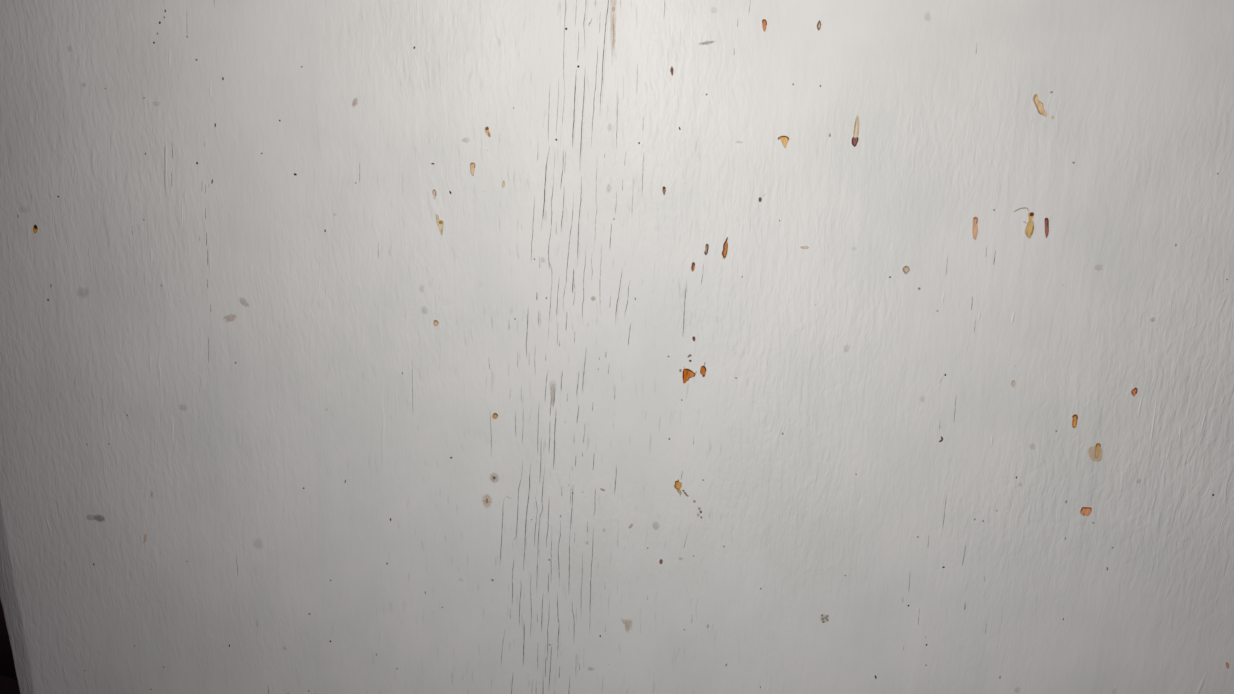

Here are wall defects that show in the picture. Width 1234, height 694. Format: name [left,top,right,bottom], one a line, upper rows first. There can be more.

crack [500,0,616,694]